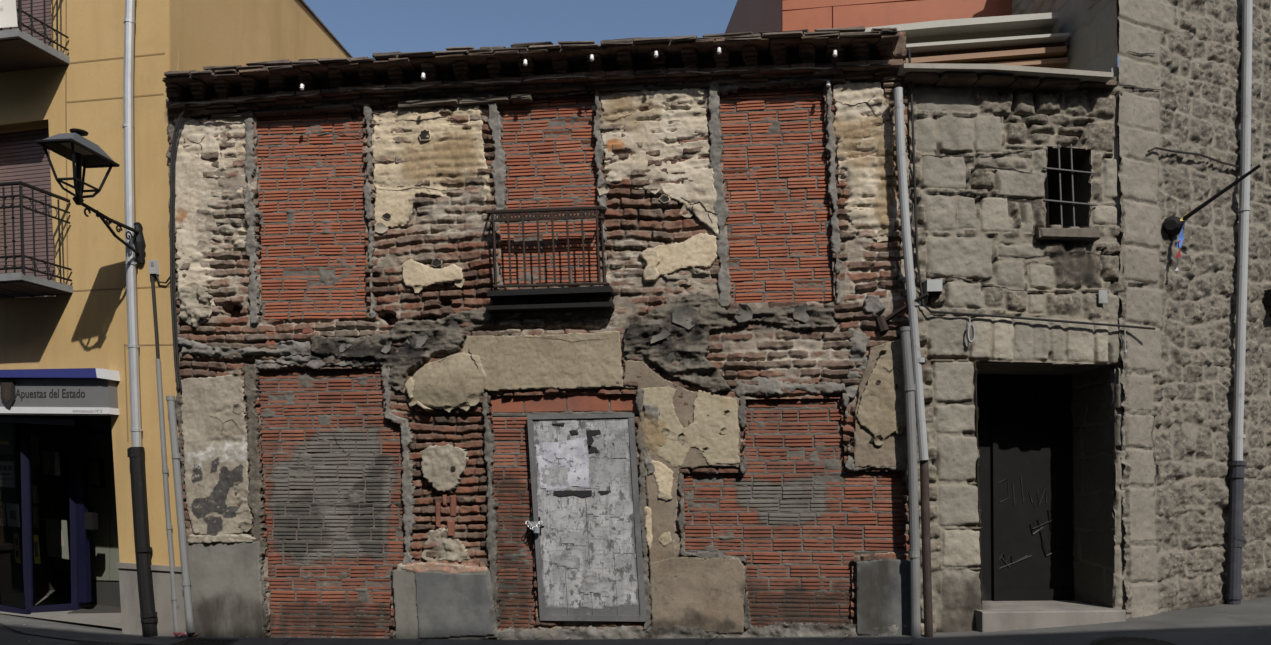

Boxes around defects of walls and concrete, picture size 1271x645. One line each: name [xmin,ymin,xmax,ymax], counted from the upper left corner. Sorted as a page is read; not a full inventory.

peeling [173,80,908,633]